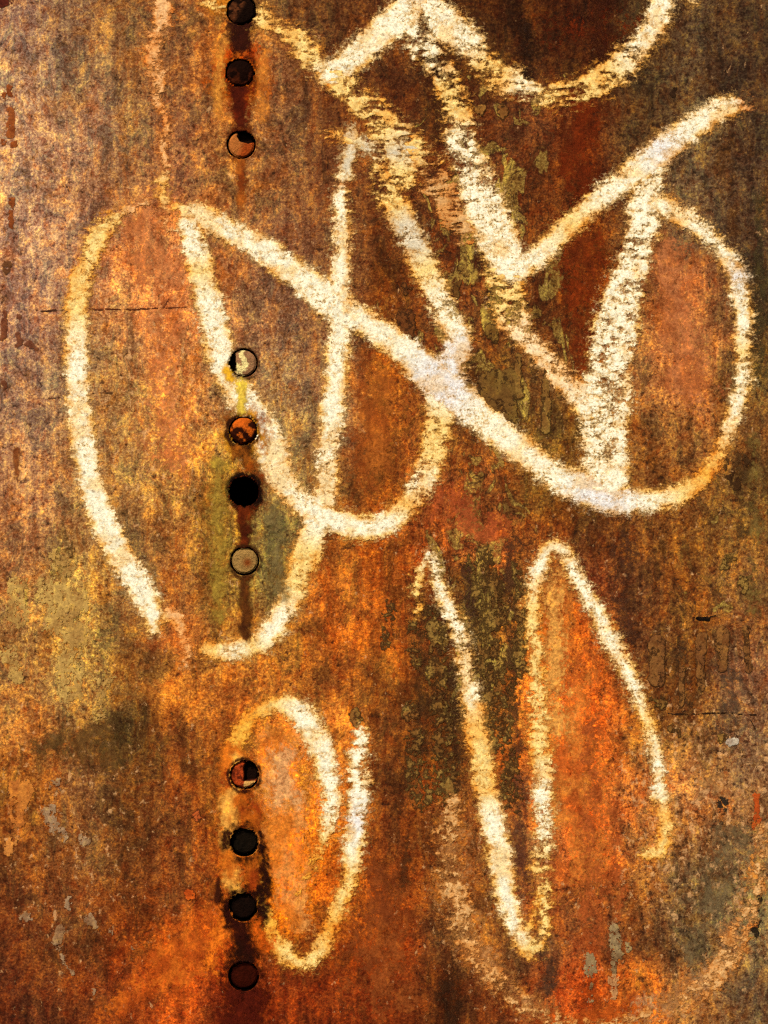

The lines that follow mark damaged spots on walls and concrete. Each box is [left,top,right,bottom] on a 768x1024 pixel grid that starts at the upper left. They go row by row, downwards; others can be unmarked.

rust [0,84,18,148]
rust [202,0,272,210]
rust [550,83,611,225]
rust [0,310,39,351]
rust [114,207,197,486]
rust [553,215,610,374]
rust [13,447,22,482]
rust [207,348,290,641]
rust [525,570,628,960]
rust [94,719,318,1024]
rust [336,849,428,1023]
rust [748,854,763,937]